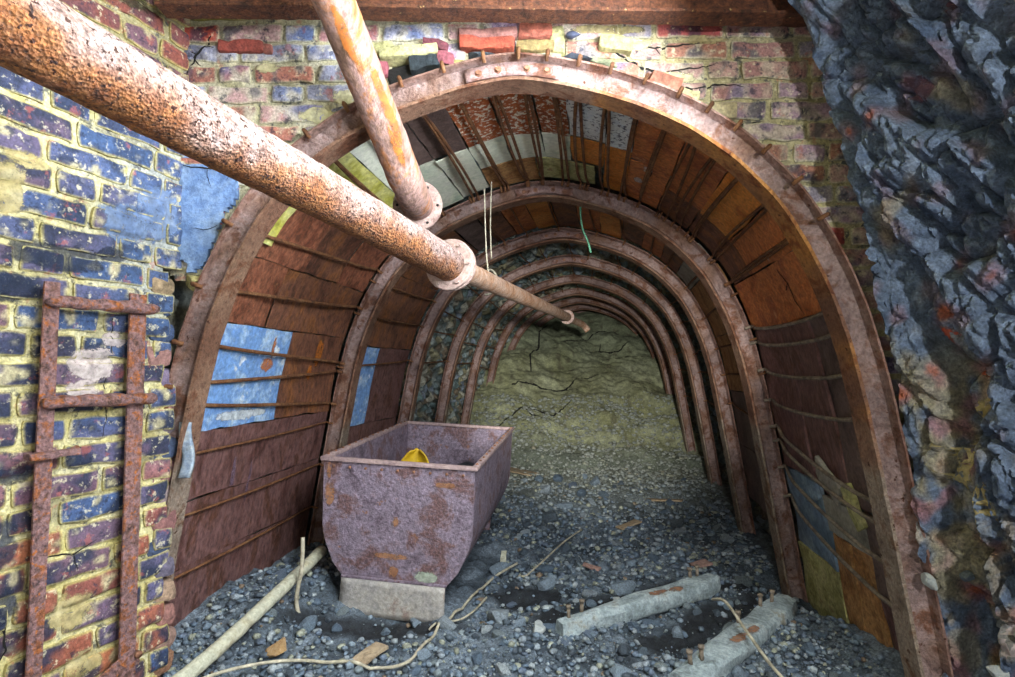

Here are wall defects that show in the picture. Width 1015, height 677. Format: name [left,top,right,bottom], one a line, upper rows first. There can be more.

crack [186,36,214,75]